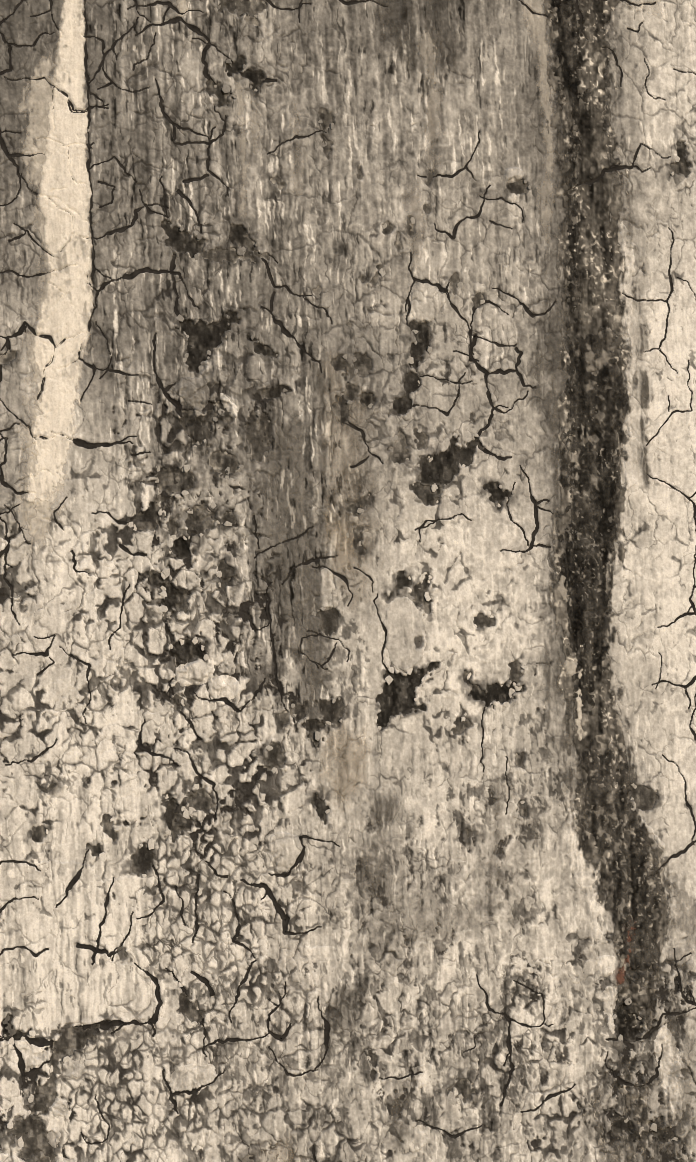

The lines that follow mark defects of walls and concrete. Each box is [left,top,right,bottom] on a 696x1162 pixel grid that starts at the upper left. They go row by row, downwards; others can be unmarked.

crack [0,0,277,724]
spalling [128,465,237,614]
crack [138,515,388,820]
peeling [375,571,439,730]
spalling [387,428,485,506]
crack [405,252,556,553]
spalling [462,660,527,709]
damp [531,0,676,1034]
crack [647,474,696,741]
peeling [0,784,217,1162]
crack [0,835,340,1114]
damp [578,1059,680,1162]